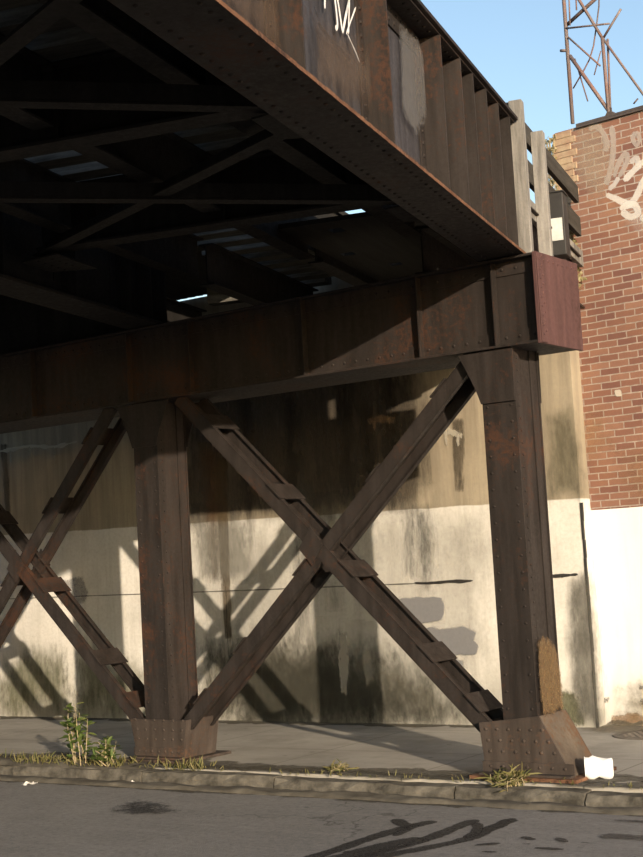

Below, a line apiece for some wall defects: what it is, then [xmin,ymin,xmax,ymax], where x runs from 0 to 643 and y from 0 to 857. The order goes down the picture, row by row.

damp [187,424,273,523]
damp [213,374,418,514]
damp [390,458,428,507]
damp [206,642,236,688]
damp [226,633,457,722]
rust [537,637,563,716]
damp [571,579,643,732]